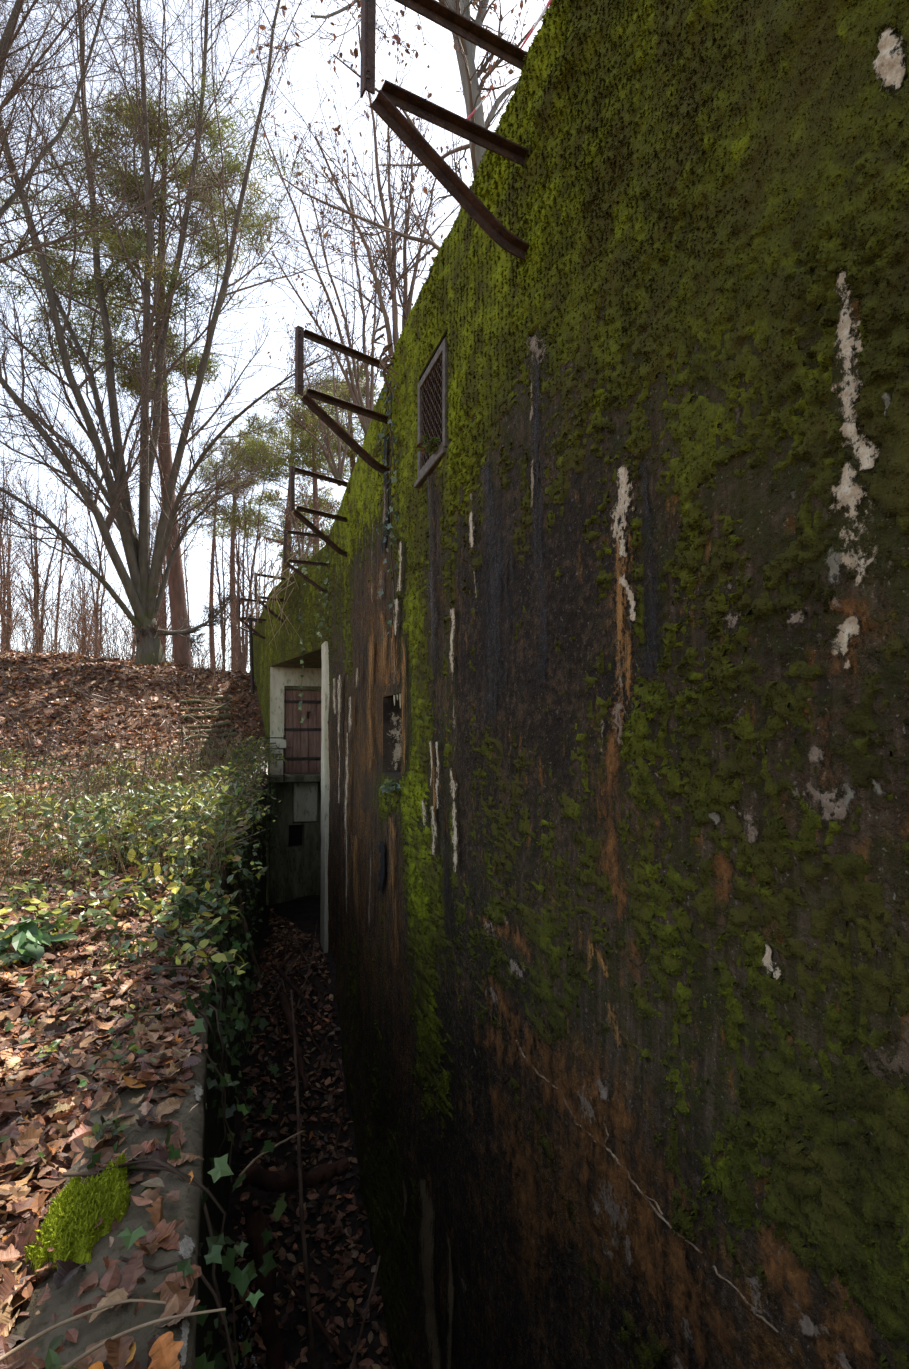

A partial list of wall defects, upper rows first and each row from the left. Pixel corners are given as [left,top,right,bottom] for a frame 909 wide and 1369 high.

peeling [873,28,905,91]
peeling [826,271,879,588]
peeling [607,465,636,744]
rust [596,697,626,915]
peeling [780,746,855,821]
crack [515,1040,779,1332]
rust [473,914,873,1369]